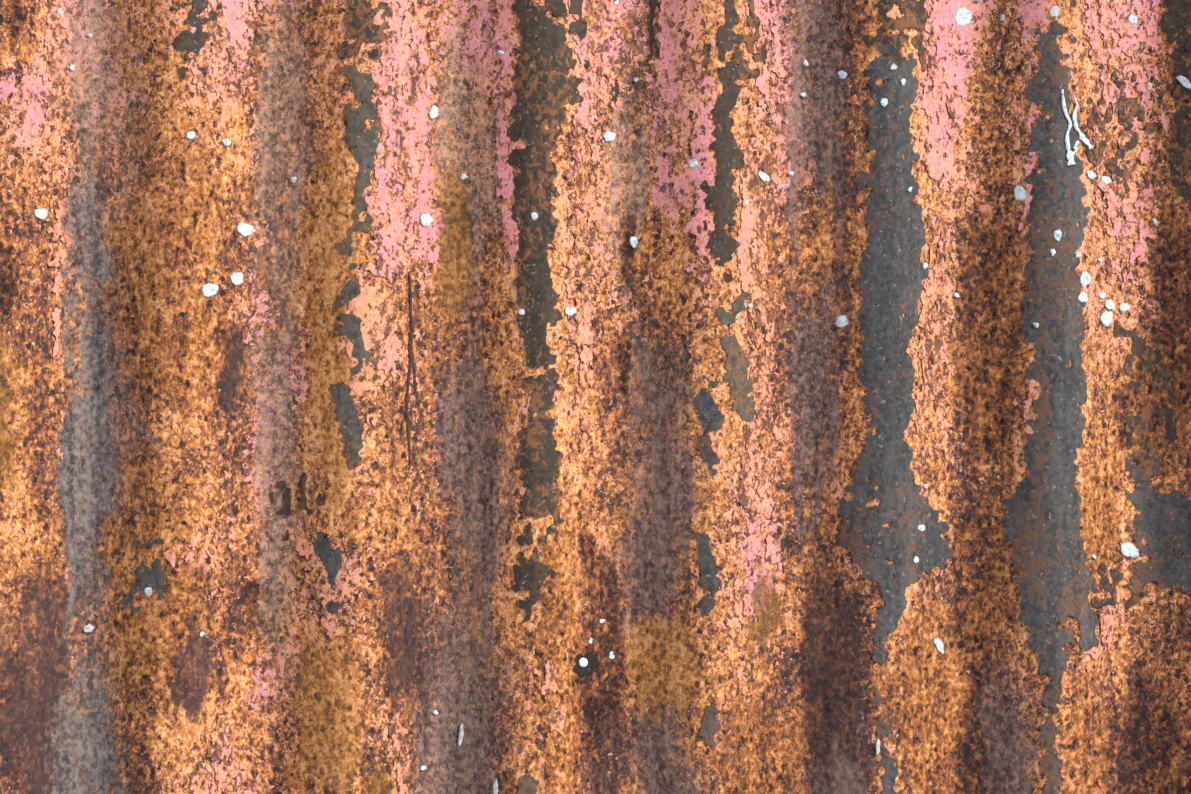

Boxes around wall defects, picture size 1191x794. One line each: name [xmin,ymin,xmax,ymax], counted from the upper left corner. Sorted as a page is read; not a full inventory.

rust [98,446,209,724]
rust [105,122,245,423]
peeling [174,0,257,98]
peeling [329,0,438,470]
peeling [486,0,629,622]
rust [537,496,697,794]
peeling [649,0,793,523]
rust [711,560,867,794]
peeling [834,0,994,664]
rust [885,213,1029,794]
peeling [998,0,1191,794]
rust [1079,194,1191,570]